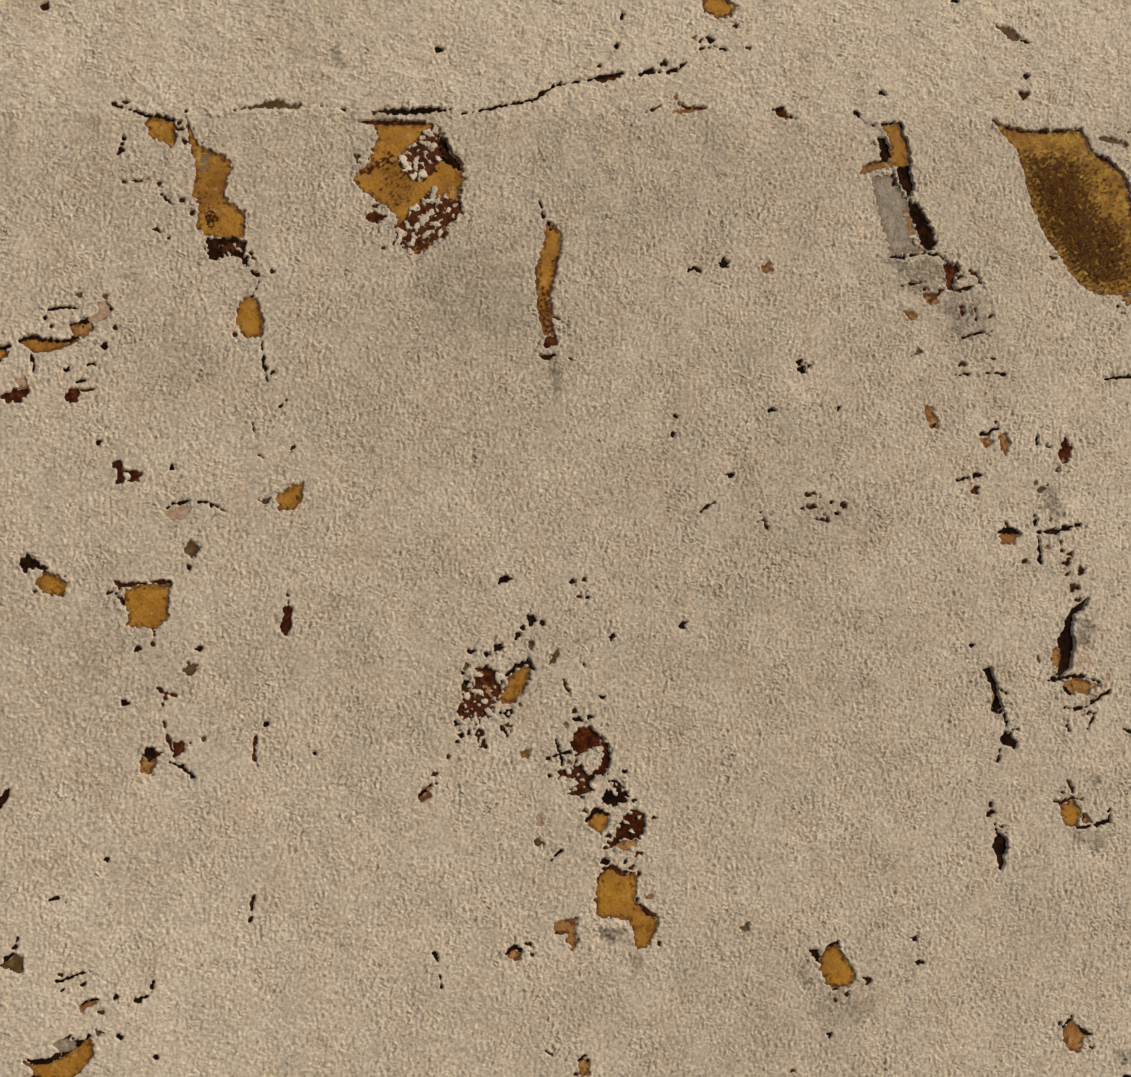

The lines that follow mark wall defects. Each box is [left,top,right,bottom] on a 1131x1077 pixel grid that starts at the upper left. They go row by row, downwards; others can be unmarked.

crack [233,99,346,112]
crack [377,35,751,116]
peeling [0,292,117,372]
peeling [111,101,275,382]
peeling [353,111,466,255]
peeling [534,201,572,362]
peeling [992,120,1131,315]
peeling [106,579,172,652]
peeling [446,614,545,759]
crack [1021,481,1111,711]
peeling [546,708,661,950]
peeling [23,1029,123,1077]